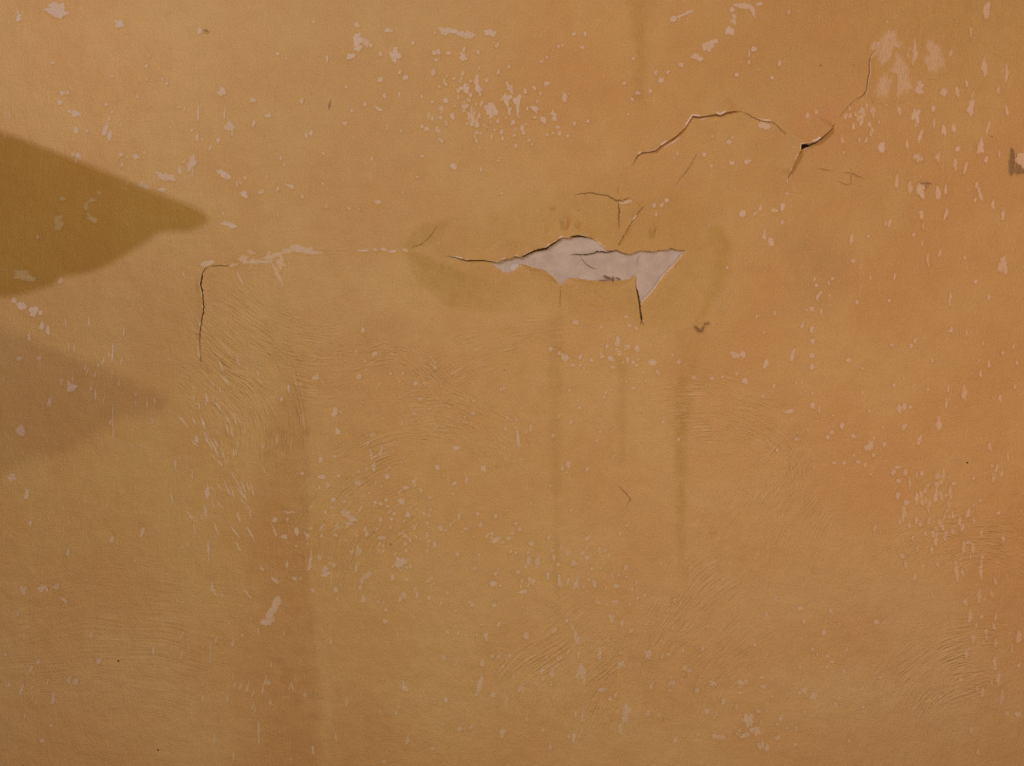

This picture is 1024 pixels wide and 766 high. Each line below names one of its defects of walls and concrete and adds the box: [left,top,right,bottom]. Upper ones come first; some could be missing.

crack [628,44,876,183]
crack [576,187,643,246]
crack [193,225,437,363]
peeling [450,223,685,391]